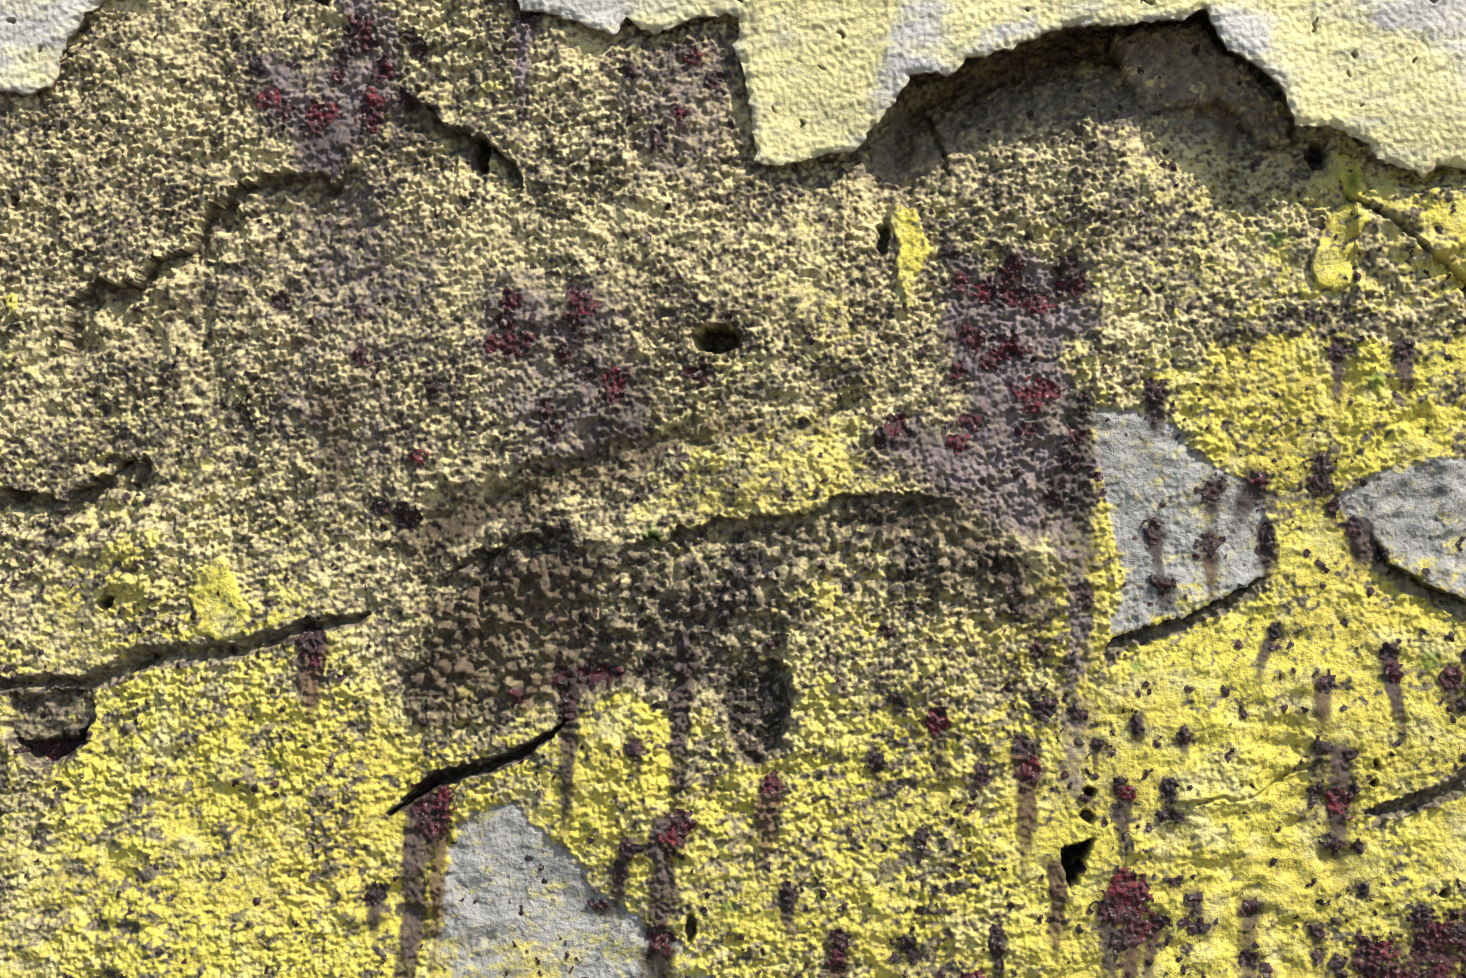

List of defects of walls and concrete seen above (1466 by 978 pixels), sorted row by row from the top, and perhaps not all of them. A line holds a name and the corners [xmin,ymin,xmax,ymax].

peeling [0,0,108,96]
spalling [393,83,525,213]
peeling [517,0,1466,310]
peeling [1088,404,1275,665]
peeling [1339,455,1466,630]
crack [0,609,372,696]
leakage [411,555,603,719]
crack [384,719,568,817]
crack [1176,757,1324,809]
crack [1363,767,1466,820]
peeling [429,801,710,978]